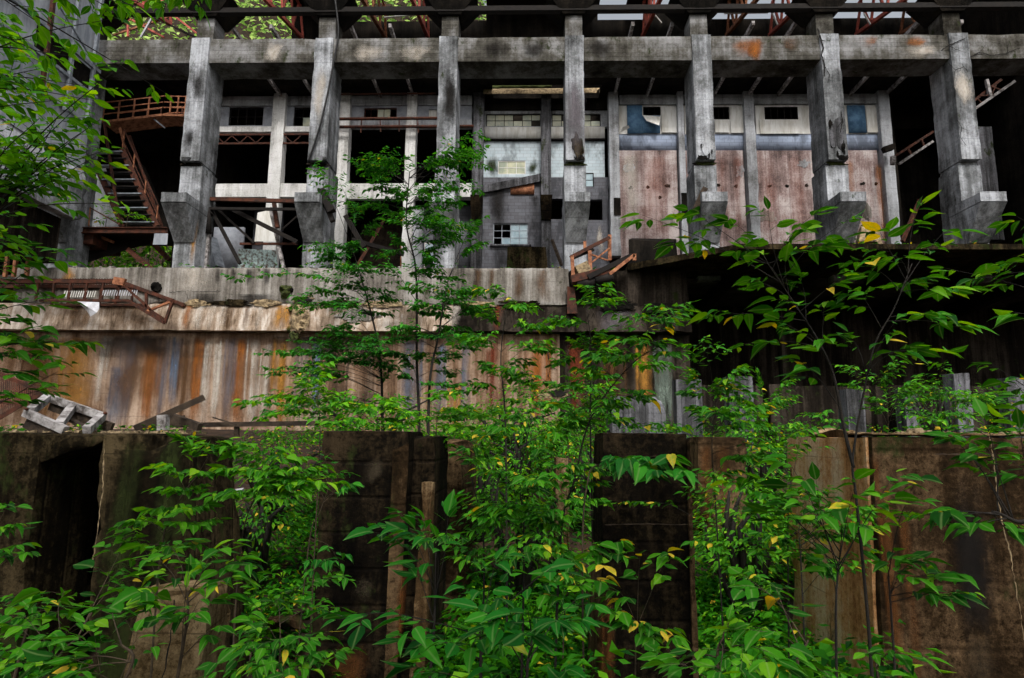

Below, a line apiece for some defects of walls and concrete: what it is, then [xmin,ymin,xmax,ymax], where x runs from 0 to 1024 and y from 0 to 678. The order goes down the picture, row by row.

crack [817,28,830,82]